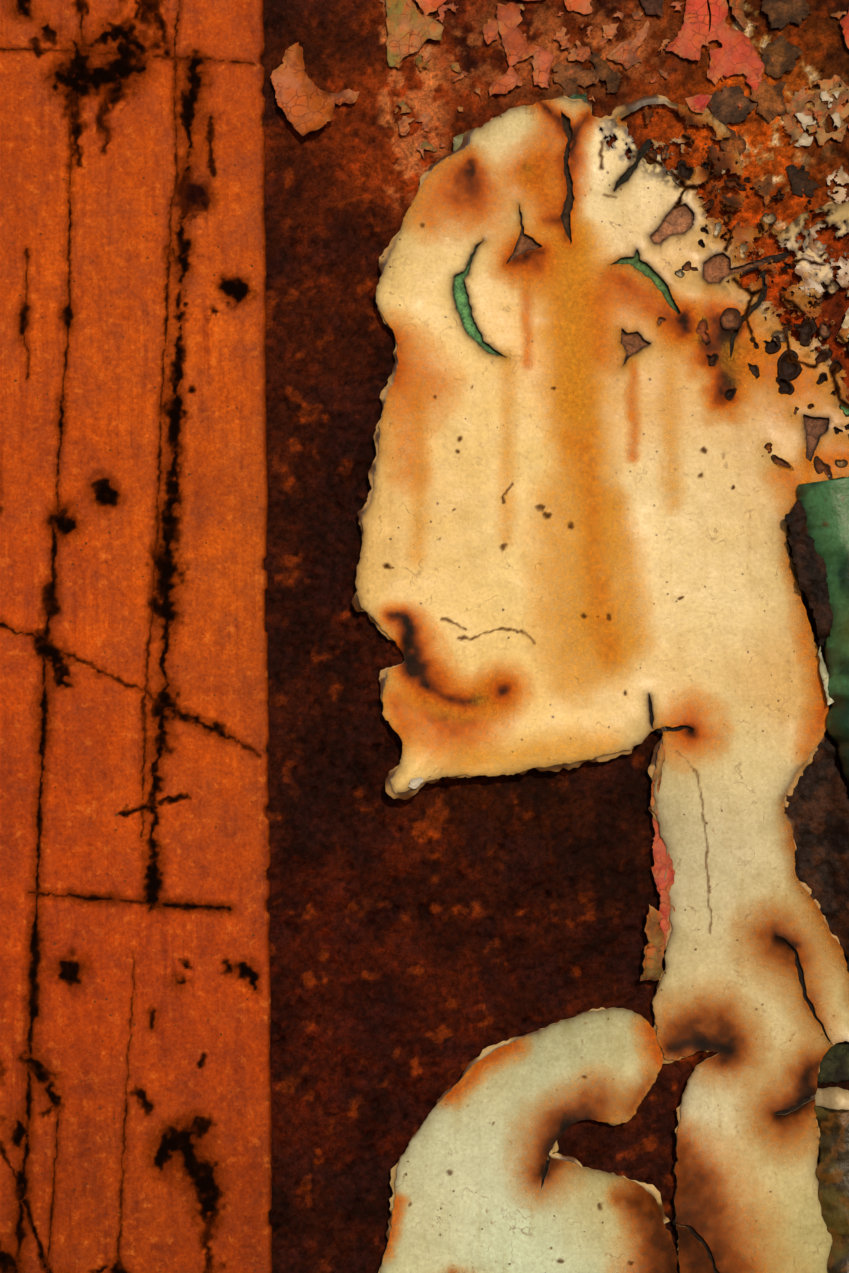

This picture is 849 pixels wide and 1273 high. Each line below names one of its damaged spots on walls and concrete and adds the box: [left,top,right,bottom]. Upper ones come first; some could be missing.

corrosion [45,12,217,178]
corrosion [386,321,448,476]
corrosion [412,100,849,687]
corrosion [379,604,527,756]
peeling [352,0,849,1273]
corrosion [664,698,721,756]
corrosion [786,559,829,761]
corrosion [745,803,849,1153]
crack [777,936,830,1042]
corrosion [519,993,760,1200]
corrosion [149,1111,226,1273]
corrosion [611,1127,767,1273]